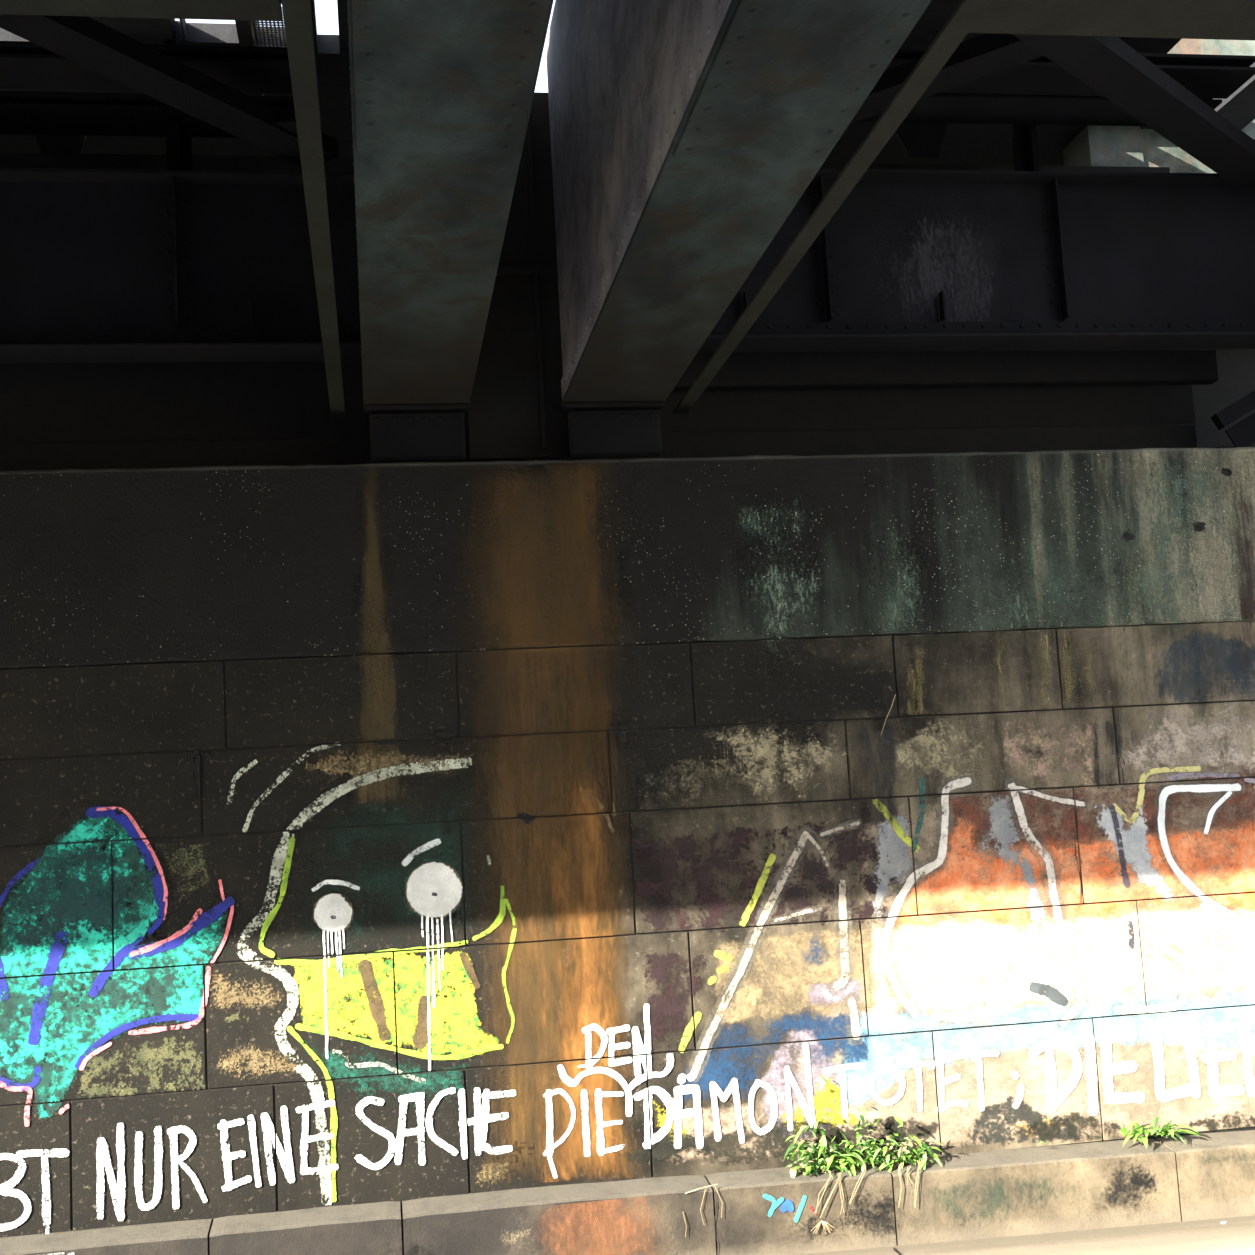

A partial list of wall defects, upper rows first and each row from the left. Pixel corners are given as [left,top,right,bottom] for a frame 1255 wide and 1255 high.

rust [355,484,400,803]
leakage [740,500,822,656]
leakage [873,533,922,638]
leakage [1115,464,1255,708]
rust [480,466,628,1171]